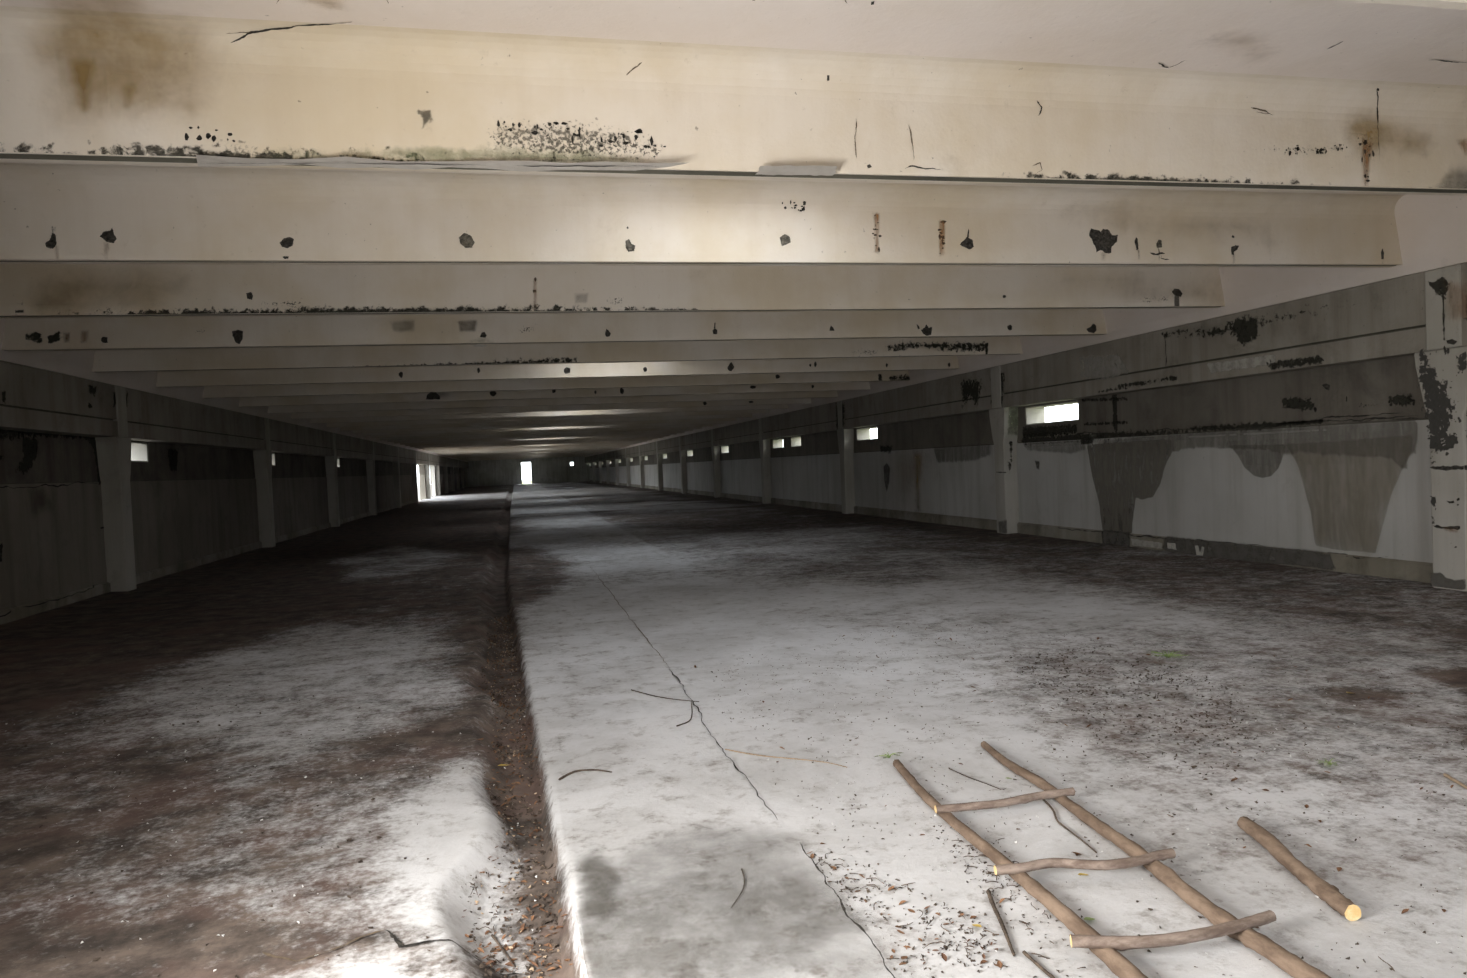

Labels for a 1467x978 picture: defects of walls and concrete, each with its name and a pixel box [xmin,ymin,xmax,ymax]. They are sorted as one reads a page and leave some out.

water stain [0,126,321,159]
water stain [493,120,666,162]
corrosion [1355,124,1380,182]
spalling [1089,228,1169,260]
peeling [1417,339,1467,471]
crack [593,570,895,978]